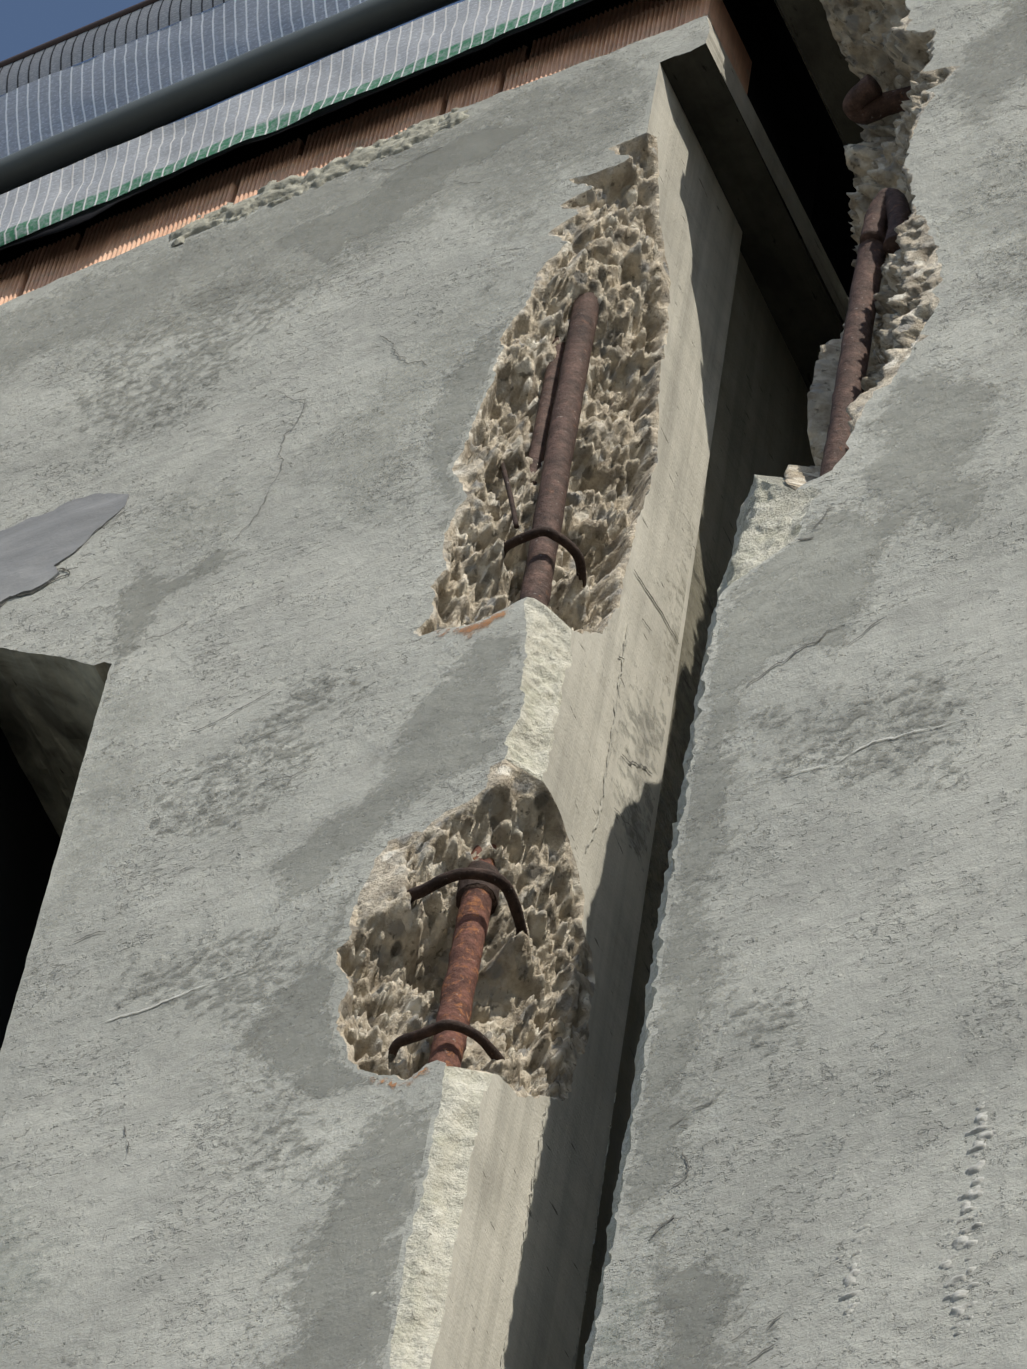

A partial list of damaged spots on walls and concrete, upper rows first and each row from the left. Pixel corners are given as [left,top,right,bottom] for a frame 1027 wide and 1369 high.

crack [232,393,306,542]
spalling [336,133,671,1369]
spalling [584,0,960,1369]